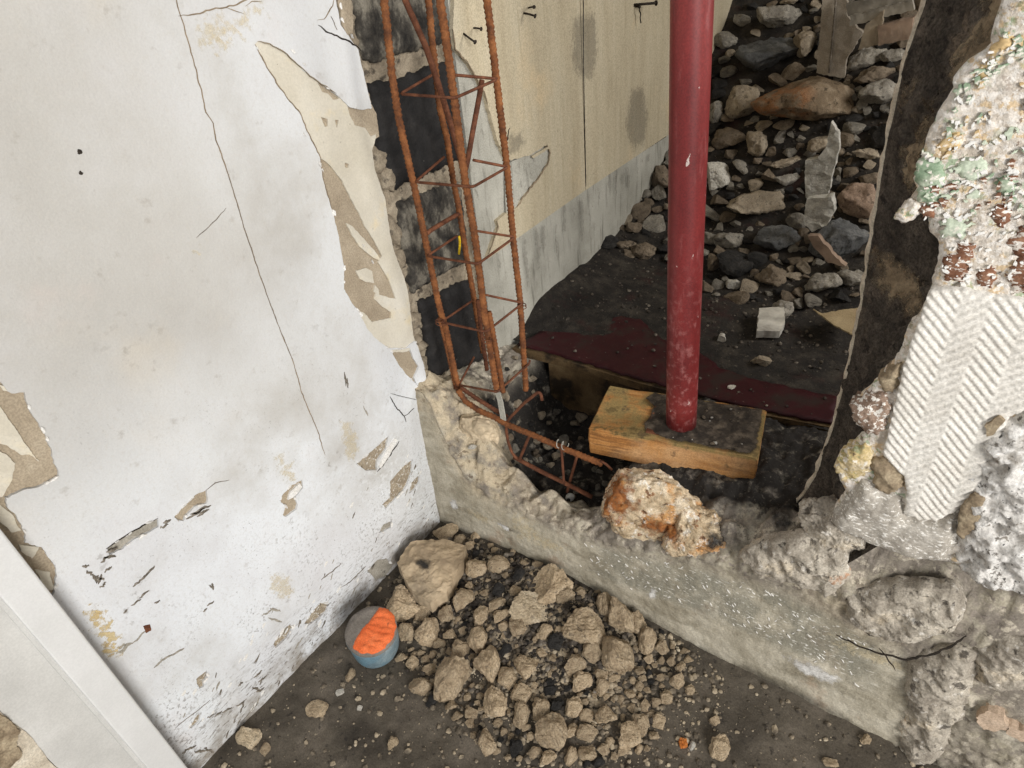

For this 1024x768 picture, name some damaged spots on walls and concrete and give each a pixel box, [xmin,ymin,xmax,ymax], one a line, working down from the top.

crack [176,0,325,454]
peeling [255,41,420,383]
spalling [380,0,629,505]
peeling [914,31,1024,295]
spalling [0,383,59,594]
spalling [100,480,228,563]
spalling [239,522,407,664]
corrosion [603,473,640,523]
corrosion [641,519,677,540]
spalling [737,496,866,598]
crack [836,635,966,671]
spalling [955,411,1024,596]